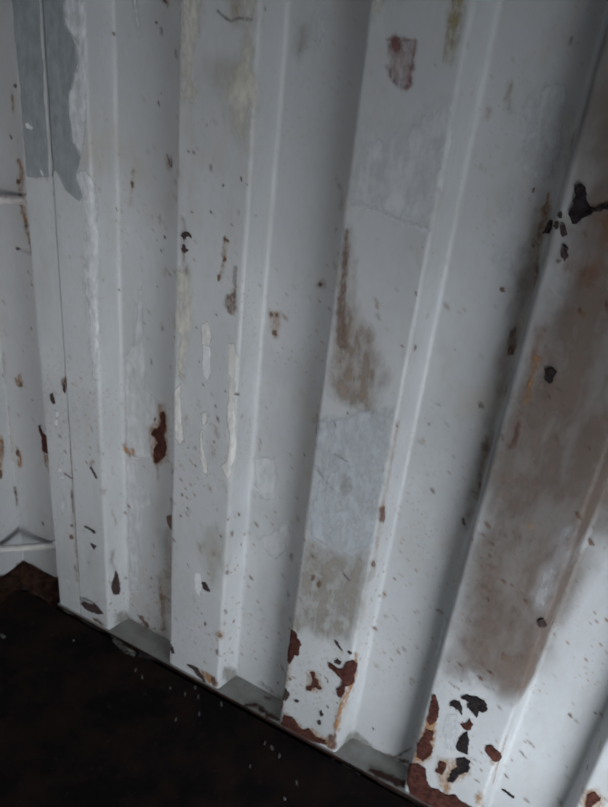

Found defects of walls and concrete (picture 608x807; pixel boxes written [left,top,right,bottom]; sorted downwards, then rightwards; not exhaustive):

water stain [337,229,374,403]
water stain [462,68,608,695]
rust [244,696,327,745]
rust [485,741,506,764]
rust [368,763,484,807]
rust [584,791,601,807]